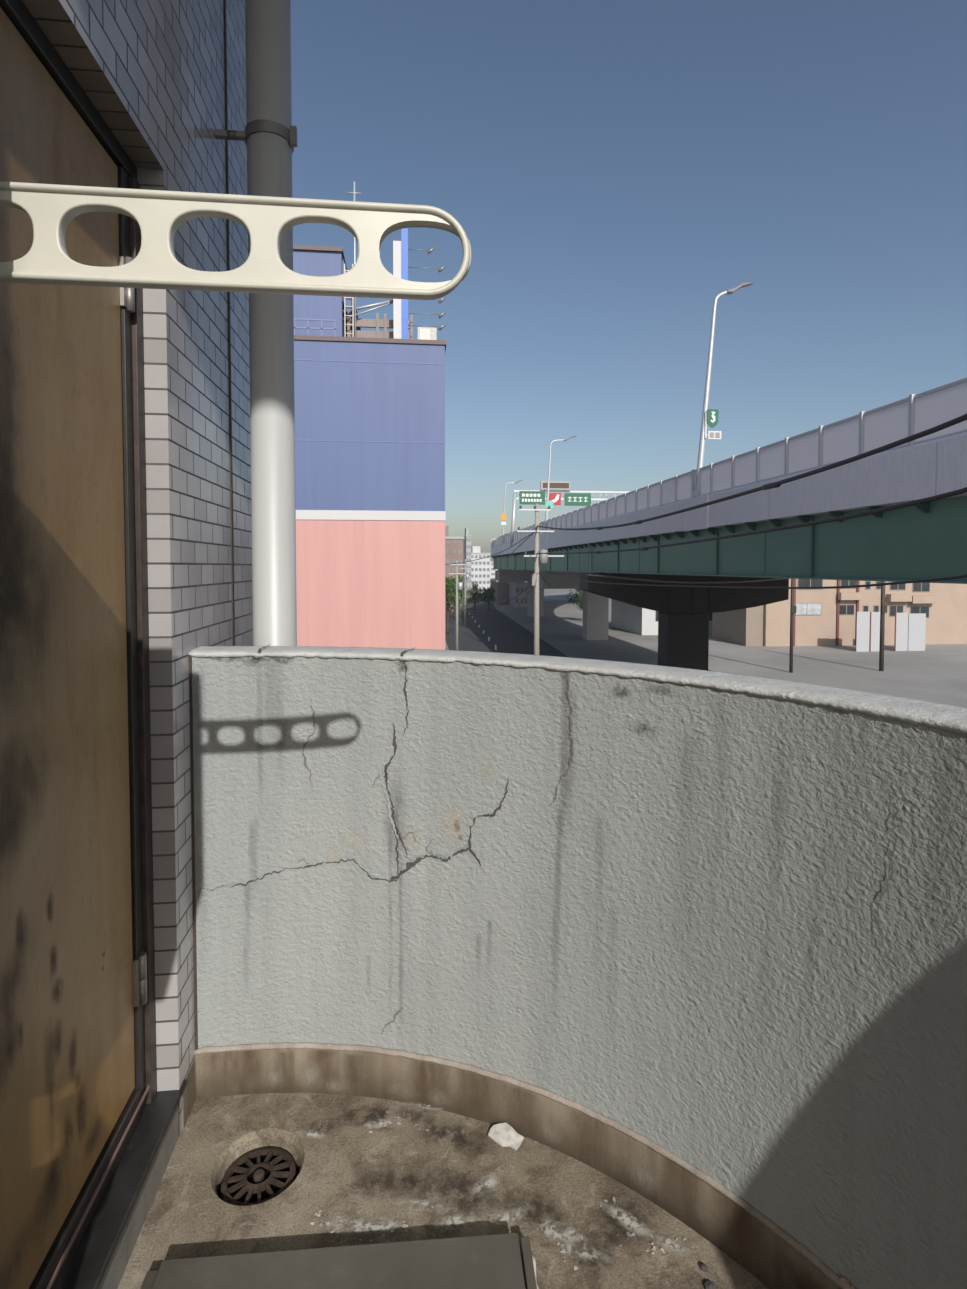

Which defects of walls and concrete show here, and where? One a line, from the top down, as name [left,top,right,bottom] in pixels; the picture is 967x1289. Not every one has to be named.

crack [204,647,509,891]
crack [877,788,923,1008]
crack [382,1007,403,1032]
leakage [476,1176,497,1192]
leakage [335,1220,397,1232]
leakage [444,1215,463,1227]
leakage [542,1223,608,1265]
leakage [609,1207,684,1252]